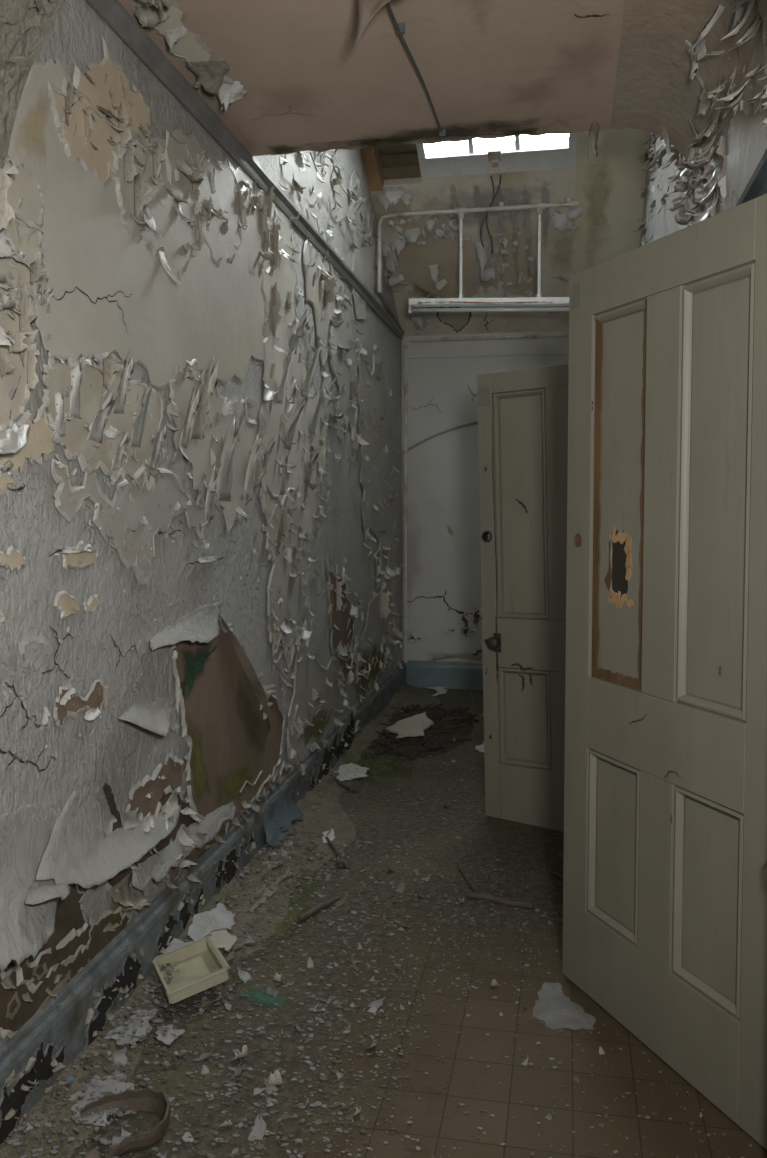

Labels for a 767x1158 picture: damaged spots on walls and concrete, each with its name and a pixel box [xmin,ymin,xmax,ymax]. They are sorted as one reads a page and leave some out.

peeling [130,0,248,111]
peeling [352,0,415,47]
crack [574,12,609,20]
peeling [0,35,570,1052]
crack [407,590,473,615]
peeling [0,1037,66,1145]